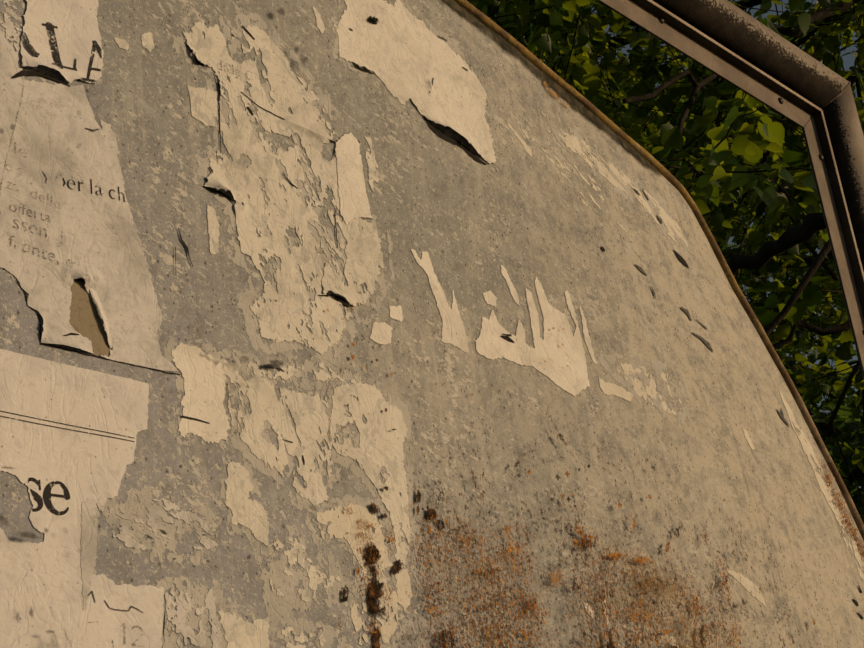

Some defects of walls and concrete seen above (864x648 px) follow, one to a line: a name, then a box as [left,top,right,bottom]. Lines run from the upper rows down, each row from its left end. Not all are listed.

corrosion [342,440,849,648]
corrosion [814,456,864,573]